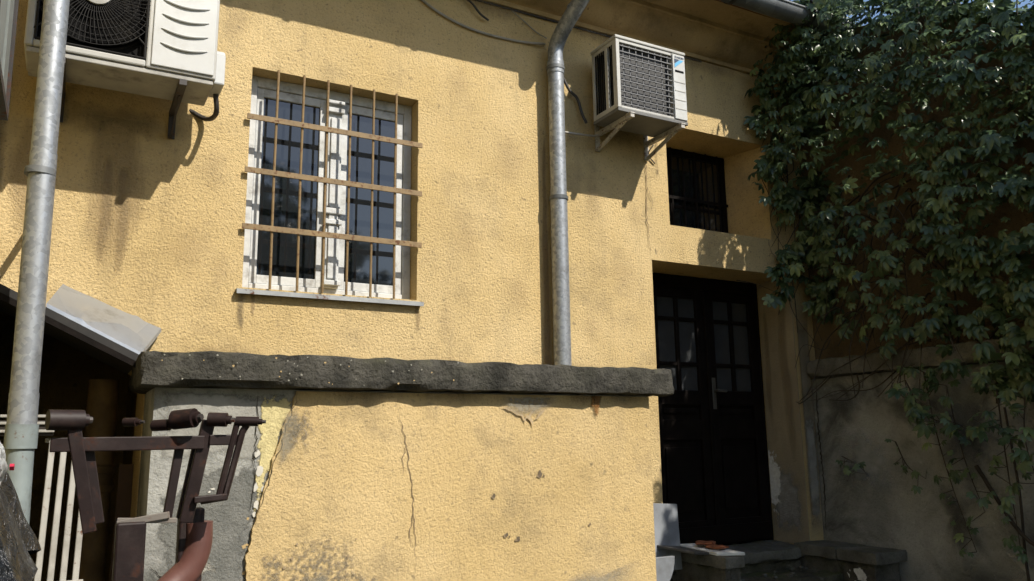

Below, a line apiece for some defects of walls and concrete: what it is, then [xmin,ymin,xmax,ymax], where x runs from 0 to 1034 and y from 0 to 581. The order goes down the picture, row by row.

spalling [158,489,182,570]
spalling [162,393,300,581]
crack [398,411,416,573]